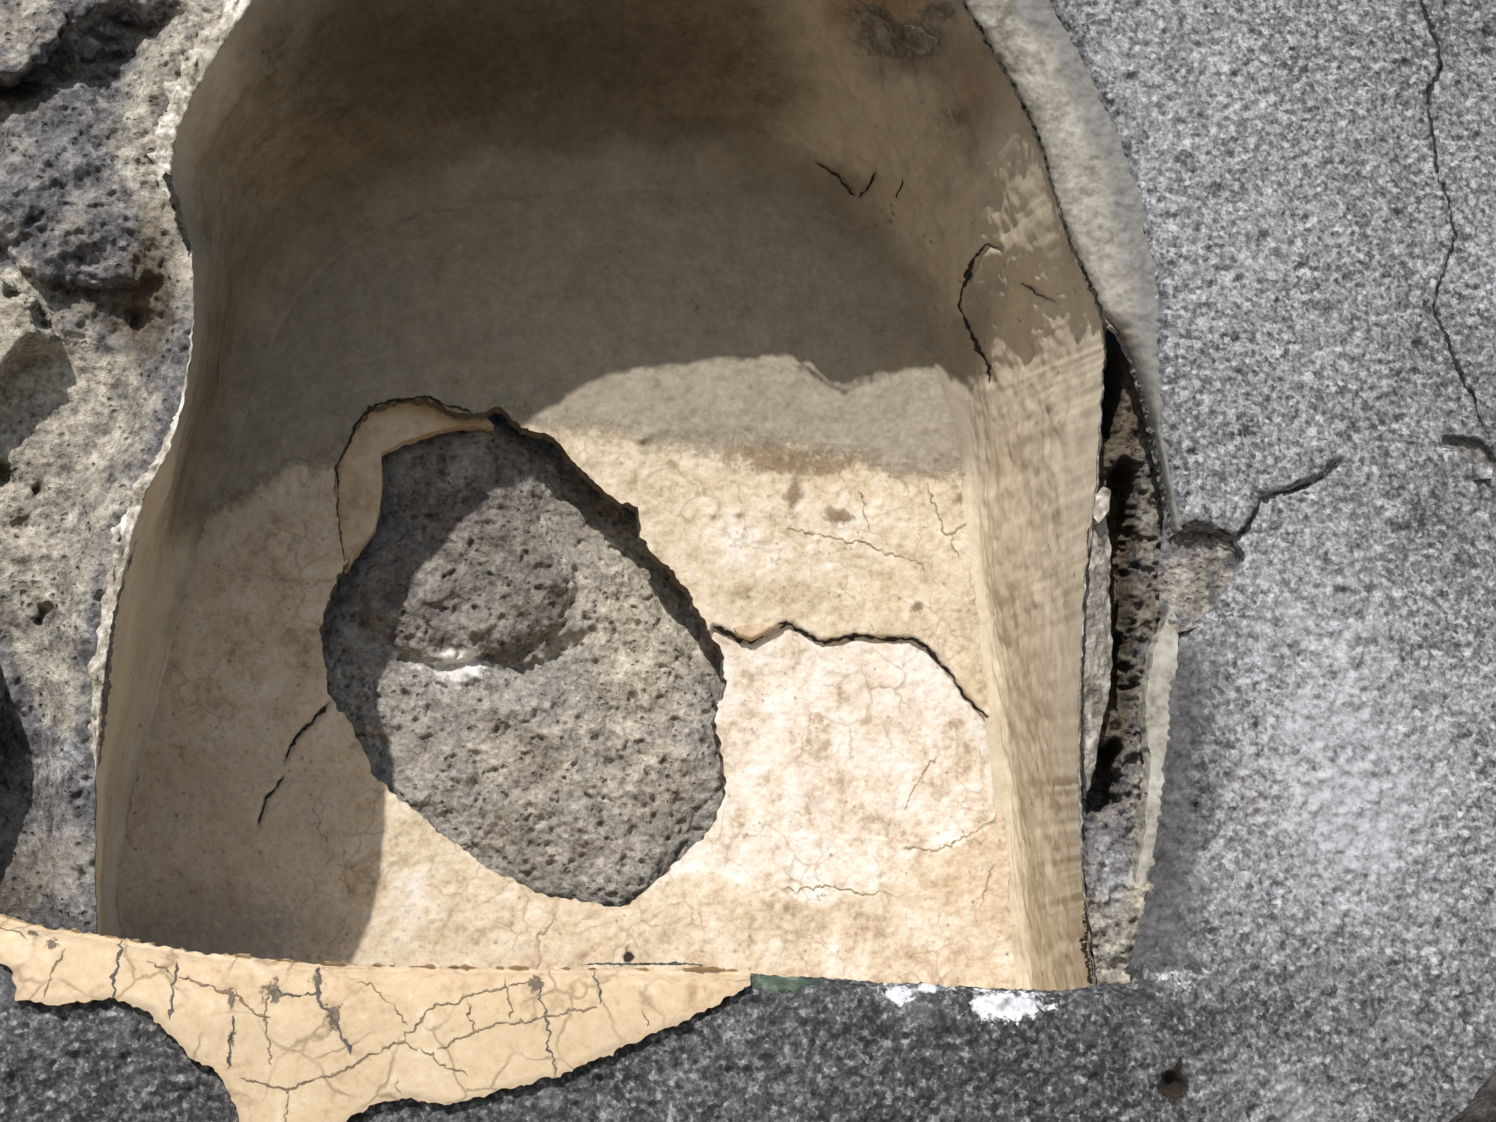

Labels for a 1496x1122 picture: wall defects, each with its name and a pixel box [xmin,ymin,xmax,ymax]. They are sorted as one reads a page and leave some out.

spalling [147,0,253,223]
crack [962,0,1107,331]
crack [1420,0,1490,439]
crack [957,243,1000,383]
spalling [86,246,195,794]
spalling [334,395,494,574]
spalling [1158,520,1240,633]
crack [1181,461,1340,540]
spalling [416,647,488,689]
crack [713,621,988,718]
crack [258,704,328,825]
peeling [0,914,751,1122]